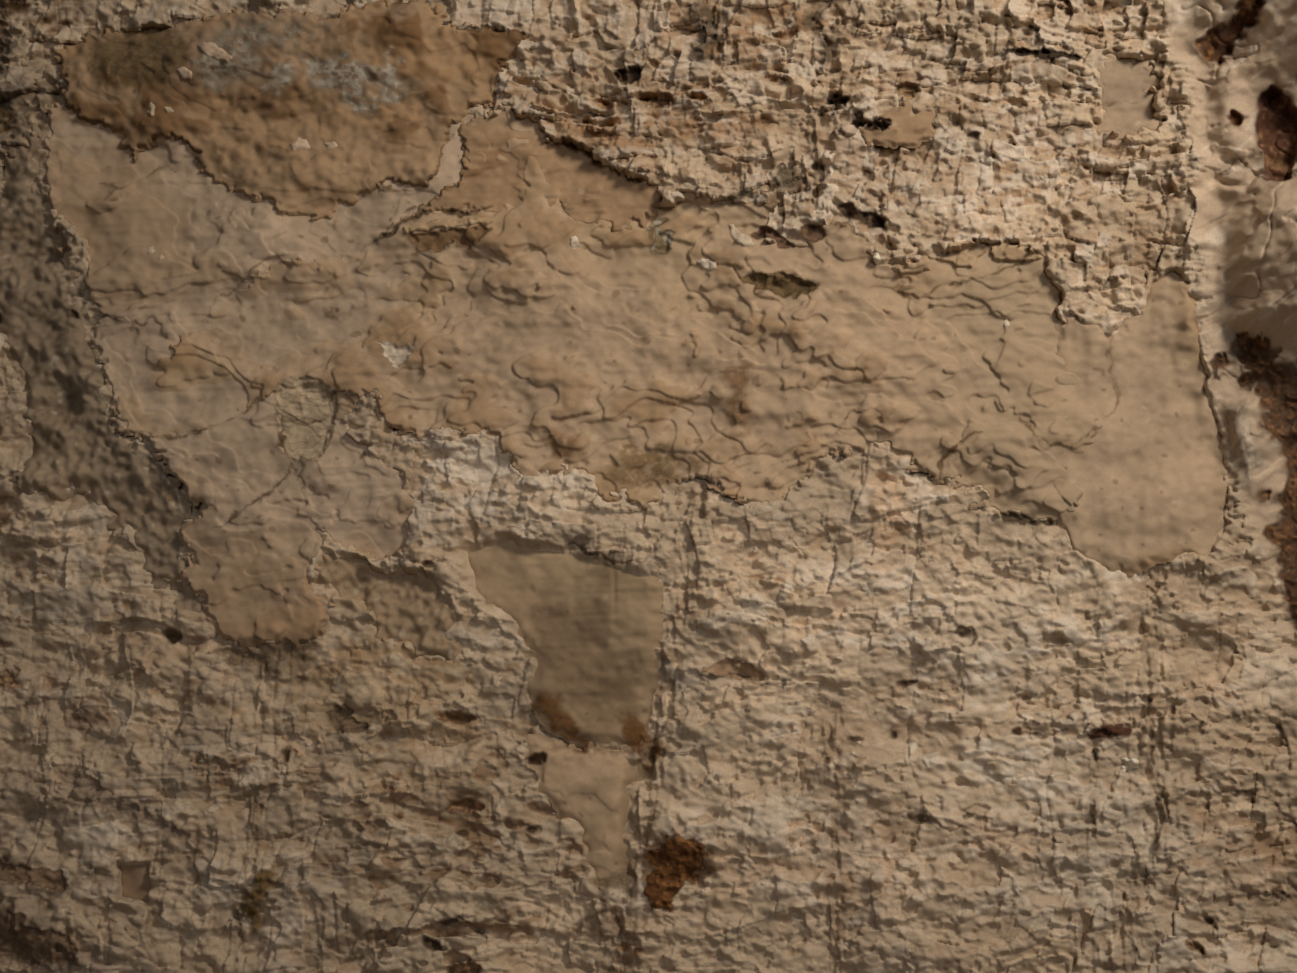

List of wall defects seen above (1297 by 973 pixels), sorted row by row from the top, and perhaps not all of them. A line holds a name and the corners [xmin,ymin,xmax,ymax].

leakage [193,23,301,91]
spalling [1003,46,1081,61]
leakage [306,51,401,111]
spalling [728,150,885,248]
spalling [403,217,493,252]
peeling [874,238,1044,275]
spalling [742,271,818,298]
crack [895,261,1023,295]
spalling [377,342,415,368]
spalling [274,375,338,461]
spalling [1000,511,1053,525]
rust [644,829,708,912]